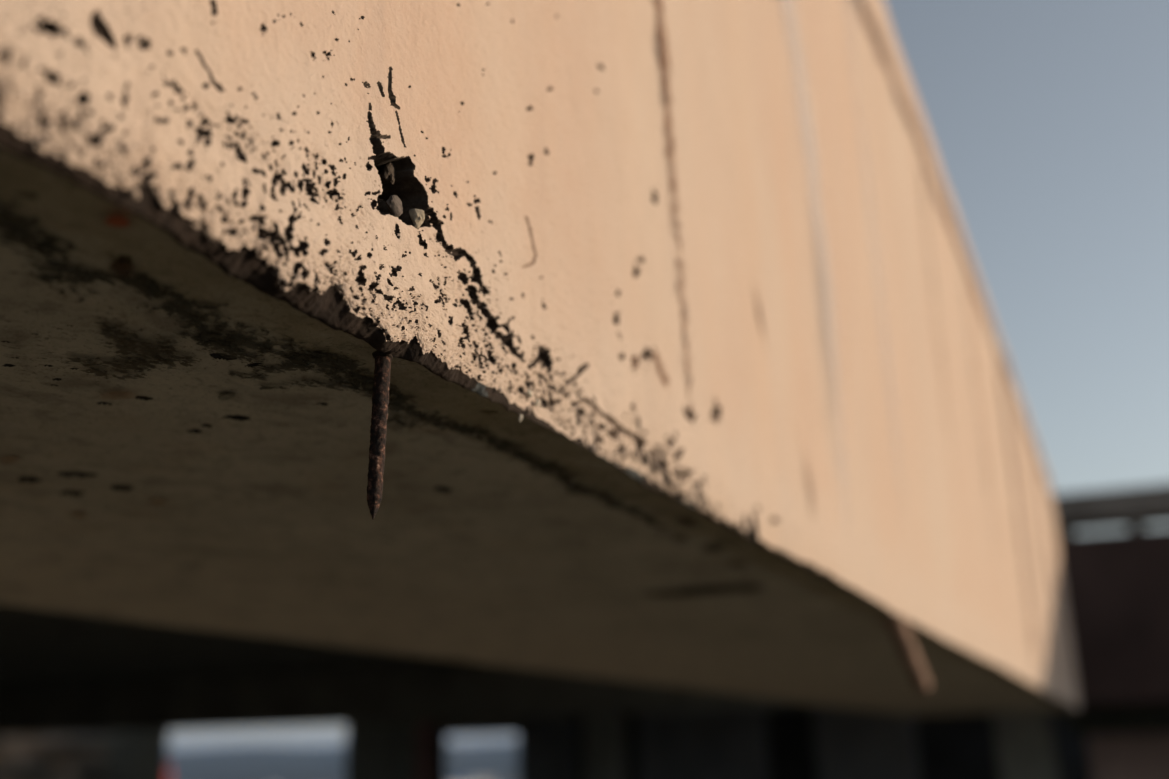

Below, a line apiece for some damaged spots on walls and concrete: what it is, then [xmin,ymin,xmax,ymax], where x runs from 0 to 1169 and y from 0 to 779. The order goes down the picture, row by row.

spalling [135,36,152,50]
spalling [166,48,225,92]
spalling [297,177,319,204]
spalling [368,152,431,228]
spalling [424,176,439,194]
spalling [443,185,493,224]
spalling [284,233,310,258]
spalling [291,261,310,281]
leakage [0,202,374,397]
spalling [612,287,655,374]
spalling [710,396,724,426]
leakage [387,384,666,529]